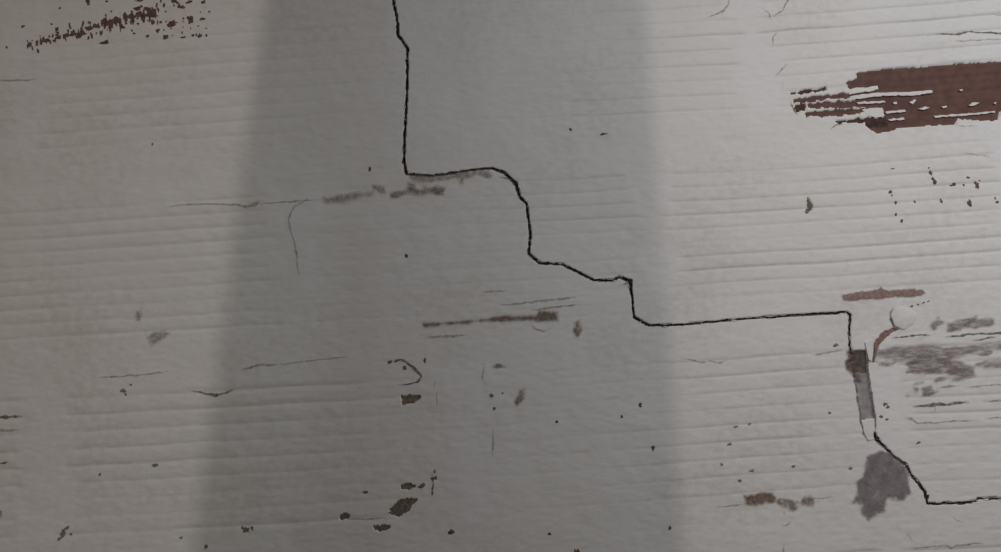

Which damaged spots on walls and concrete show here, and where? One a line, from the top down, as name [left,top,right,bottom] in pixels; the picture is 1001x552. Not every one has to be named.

crack [942,28,1001,36]
crack [392,0,854,354]
peeling [843,287,929,440]
crack [874,432,1001,505]